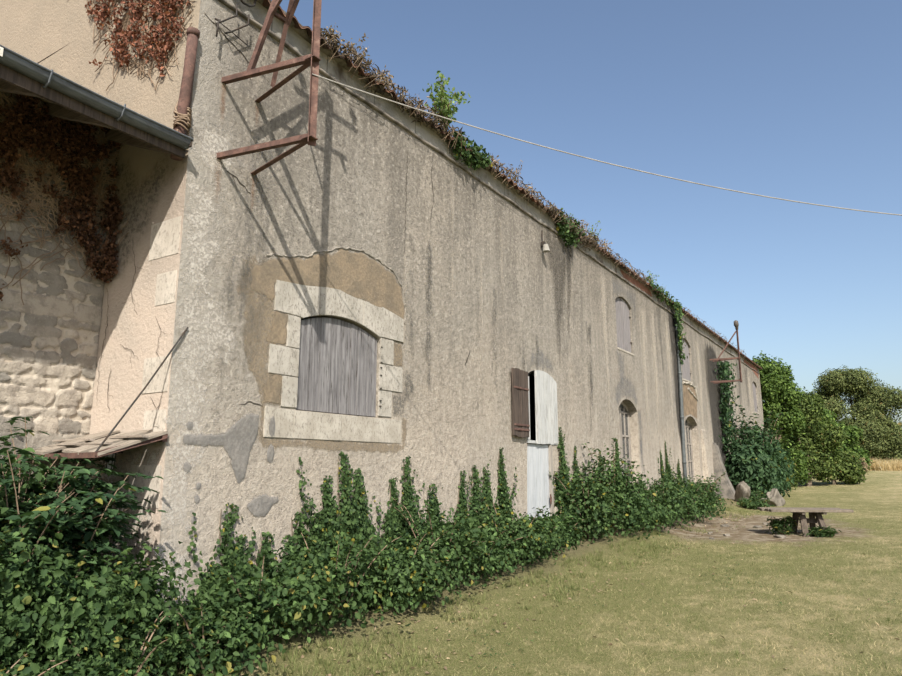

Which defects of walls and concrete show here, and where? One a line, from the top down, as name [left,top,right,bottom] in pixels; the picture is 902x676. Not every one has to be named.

crack [96,252,165,408]
peeling [237,246,413,453]
water stain [546,231,572,342]
water stain [602,282,682,463]